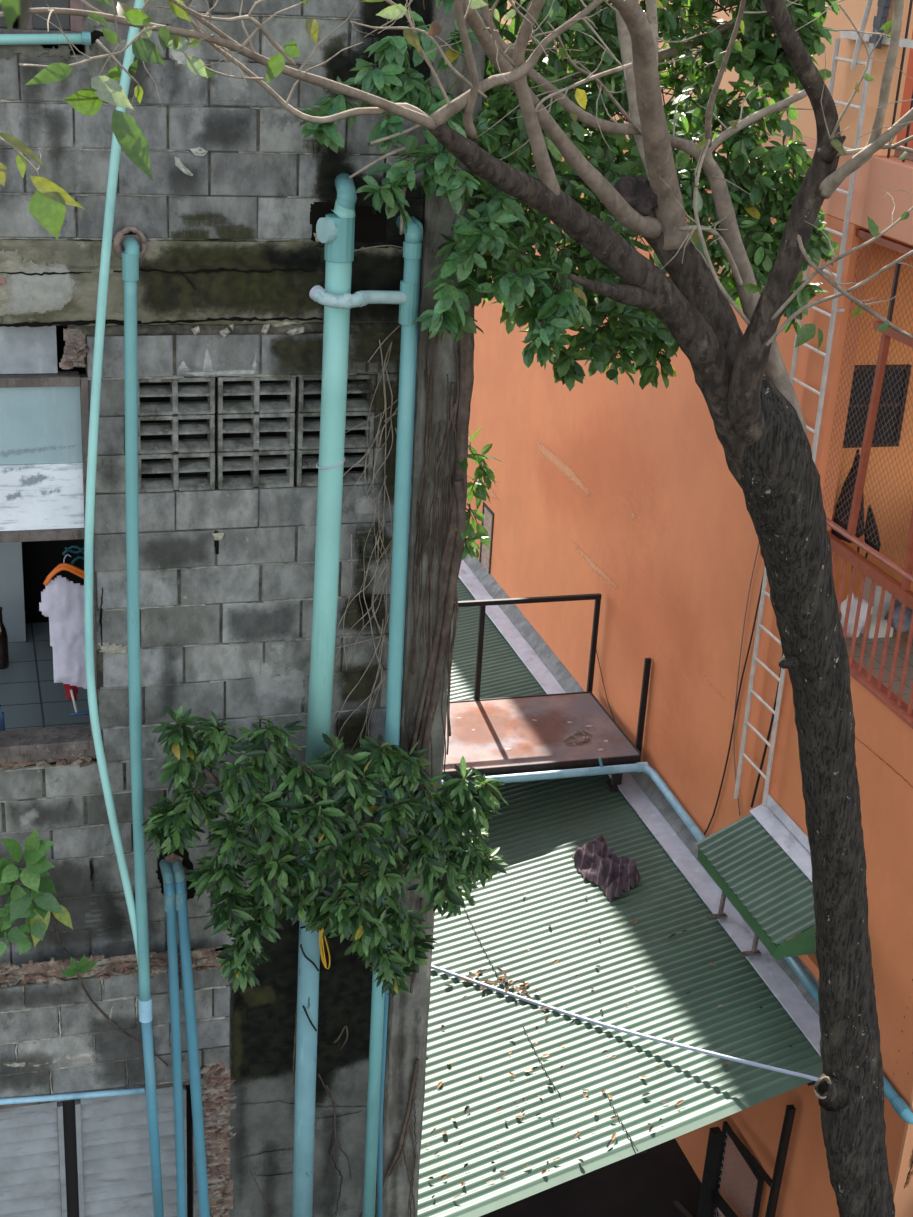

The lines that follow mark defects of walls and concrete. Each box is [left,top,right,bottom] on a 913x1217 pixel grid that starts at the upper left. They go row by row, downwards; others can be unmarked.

flaking render [0,249,77,317]